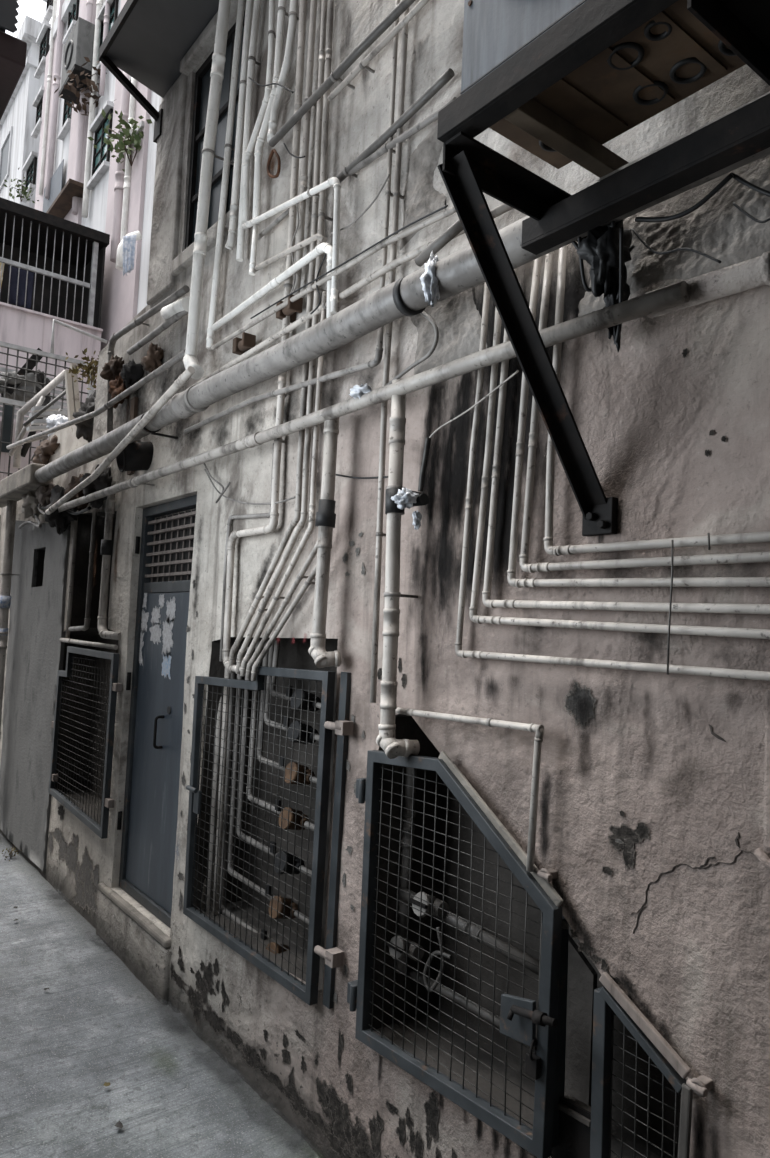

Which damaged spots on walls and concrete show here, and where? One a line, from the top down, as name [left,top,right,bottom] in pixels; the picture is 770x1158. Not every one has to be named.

leakage [472,286,505,348]
leakage [524,254,591,330]
leakage [412,357,543,615]
leakage [564,682,609,774]
peeling [48,805,99,914]
spalling [602,810,650,876]
crack [632,832,754,934]
leakage [464,1110,537,1158]